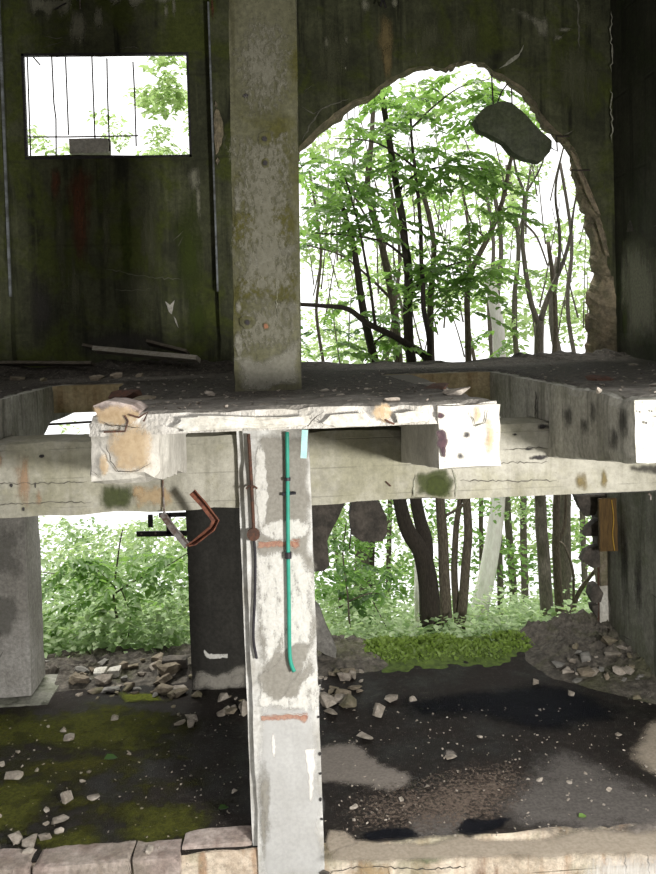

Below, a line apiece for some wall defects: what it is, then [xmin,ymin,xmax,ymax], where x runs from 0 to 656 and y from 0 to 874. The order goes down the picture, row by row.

spalling [556,135,610,258]
water stain [609,412,626,448]
water stain [0,598,16,634]
crack [331,866,466,874]